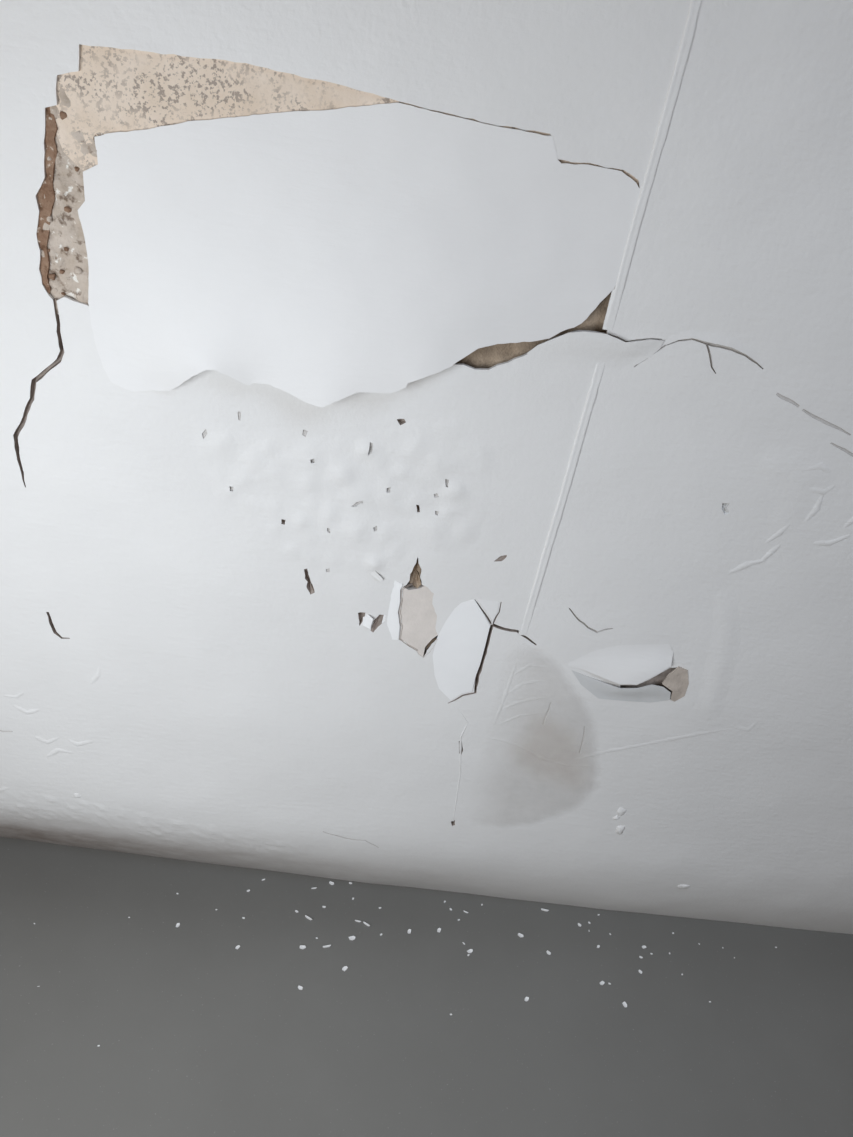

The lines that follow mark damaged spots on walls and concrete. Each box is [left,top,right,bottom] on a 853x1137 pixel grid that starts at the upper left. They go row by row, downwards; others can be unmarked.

peeling [37,44,664,407]
crack [608,329,763,374]
crack [13,298,64,487]
crack [776,393,853,457]
crack [46,612,70,639]
peeling [358,558,499,700]
crack [569,608,613,633]
peeling [568,644,689,703]